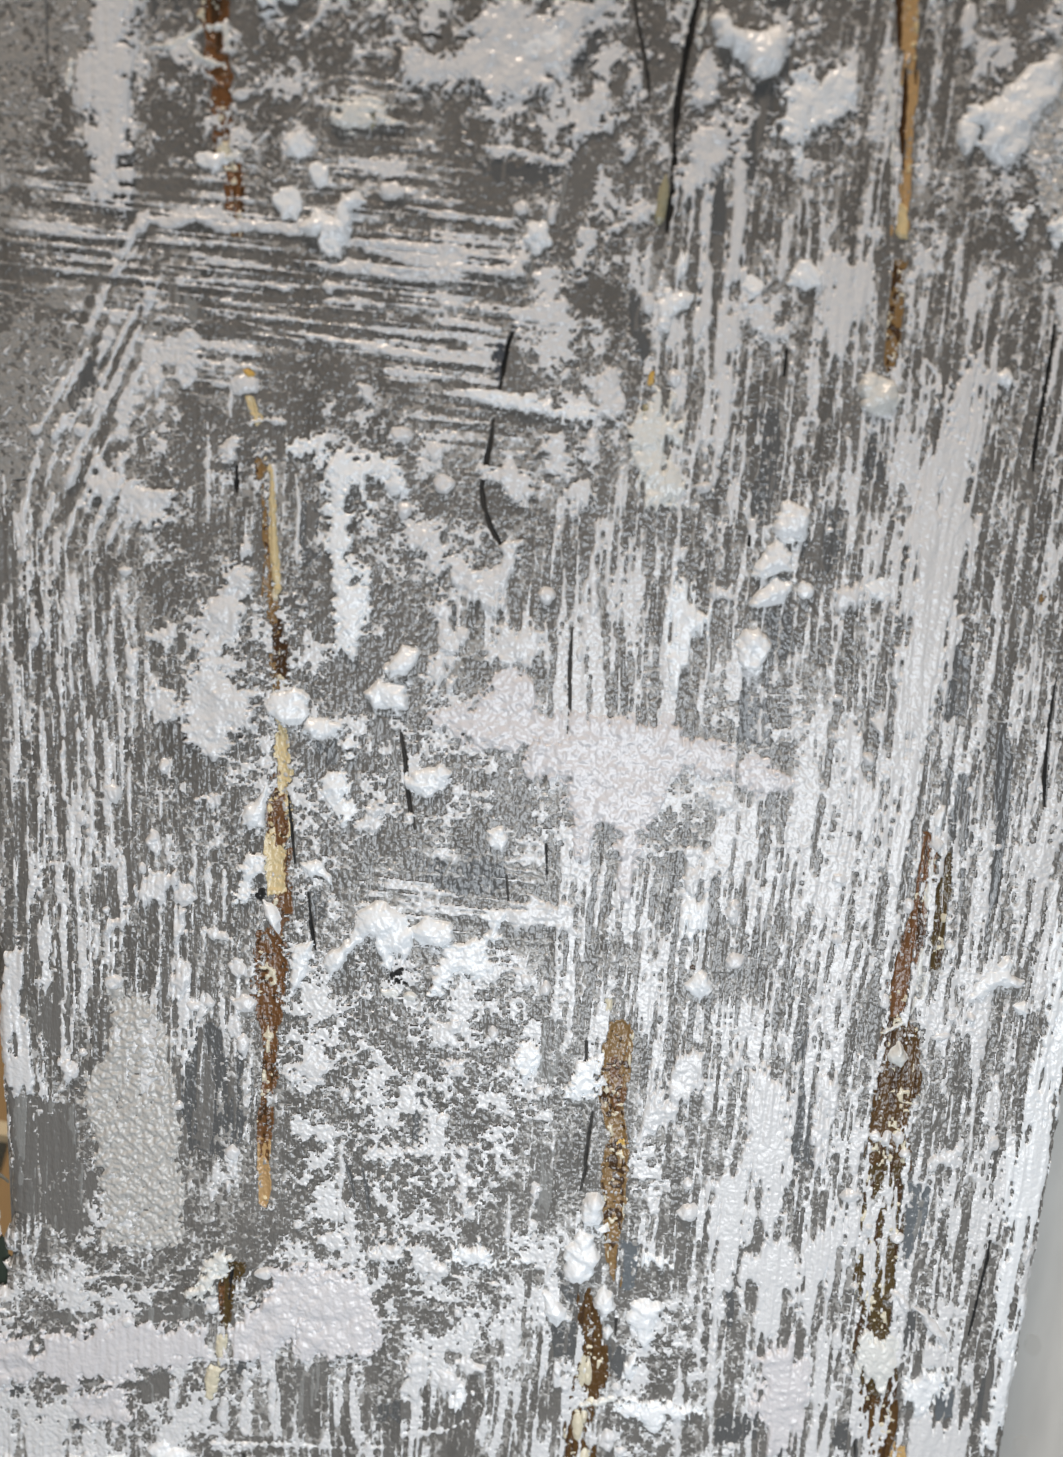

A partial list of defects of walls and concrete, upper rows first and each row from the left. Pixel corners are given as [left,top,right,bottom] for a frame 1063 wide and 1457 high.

crack [633,0,700,233]
corrosion [884,260,908,373]
corrosion [255,457,289,691]
corrosion [250,764,293,1162]
corrosion [598,1019,634,1288]